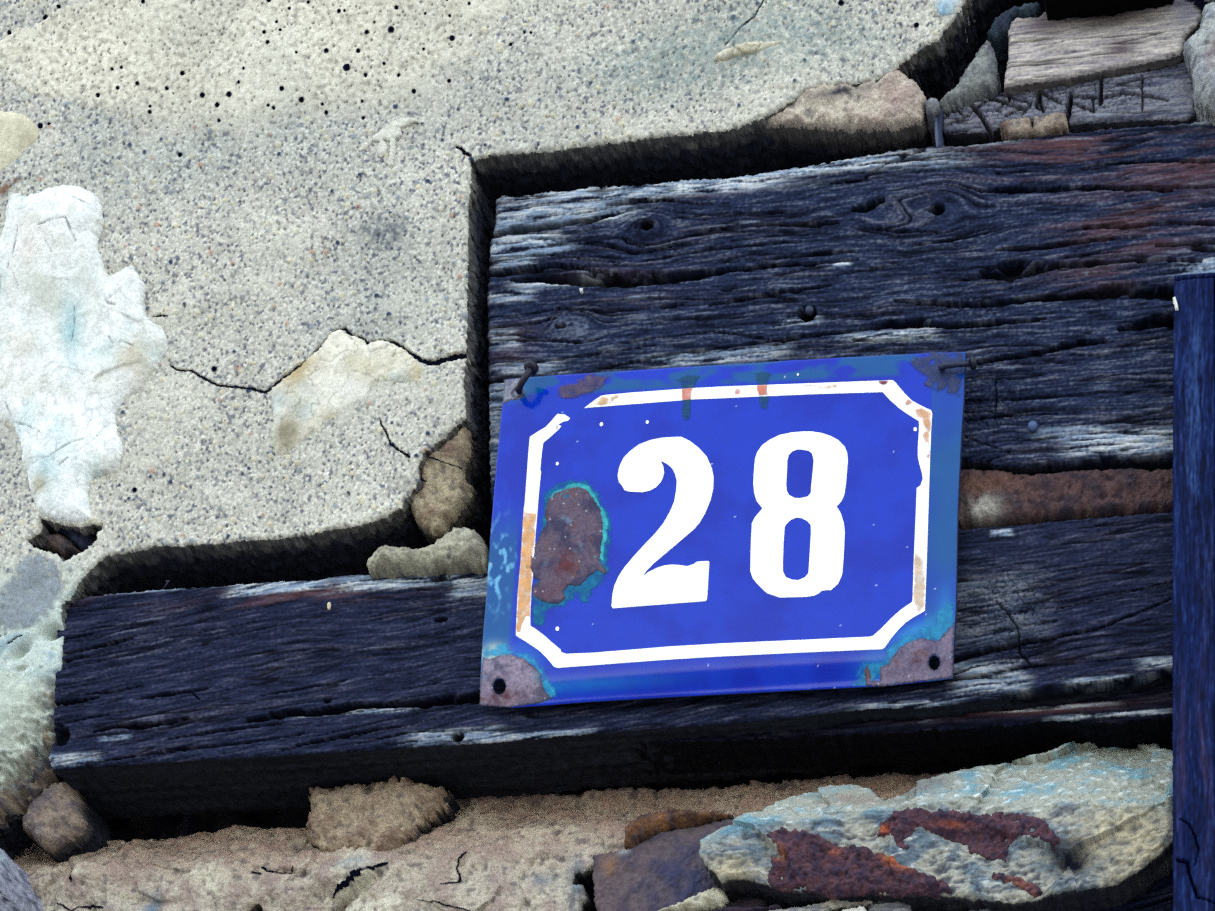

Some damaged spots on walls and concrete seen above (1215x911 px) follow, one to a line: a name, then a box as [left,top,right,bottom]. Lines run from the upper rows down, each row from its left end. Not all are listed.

crack [171,328,467,394]
rust [766,807,1060,900]